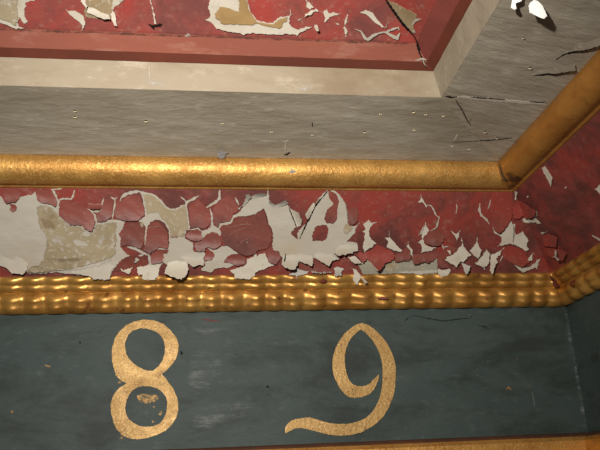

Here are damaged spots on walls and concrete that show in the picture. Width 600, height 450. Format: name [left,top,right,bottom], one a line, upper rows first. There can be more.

peeling [0,0,35,29]
peeling [66,0,124,31]
peeling [206,0,338,36]
peeling [356,1,421,41]
crack [385,0,427,67]
peeling [529,0,547,19]
crack [445,96,546,126]
peeling [0,189,566,285]